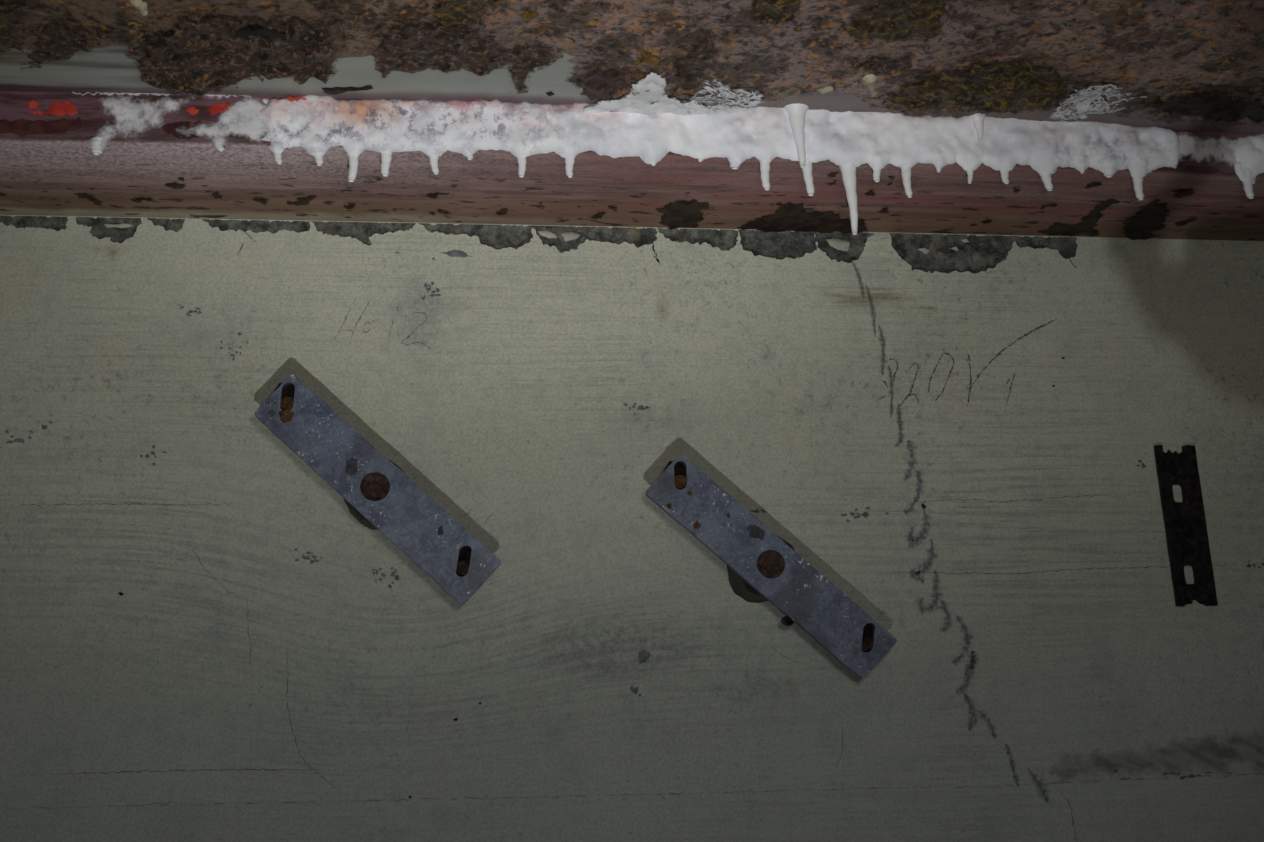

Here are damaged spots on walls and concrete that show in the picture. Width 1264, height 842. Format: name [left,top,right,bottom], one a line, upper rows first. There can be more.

corrosion [0,0,1264,128]
damp [259,72,1181,235]
damp [1233,134,1264,199]
spalling [0,215,185,243]
spalling [202,219,874,263]
spalling [889,233,1078,274]